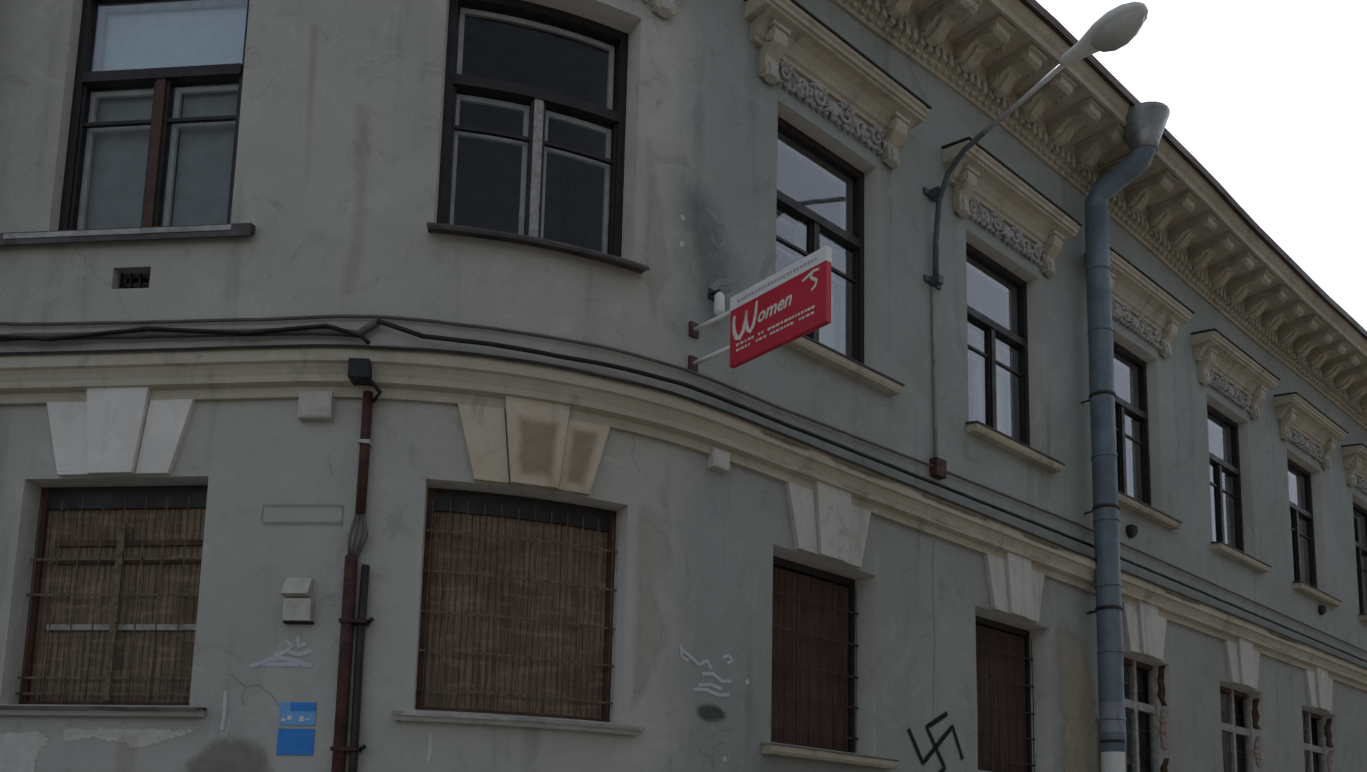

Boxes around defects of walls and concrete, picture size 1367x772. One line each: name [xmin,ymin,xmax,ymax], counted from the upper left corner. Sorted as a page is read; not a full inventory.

peeling [0,727,199,772]
damp [189,743,267,772]